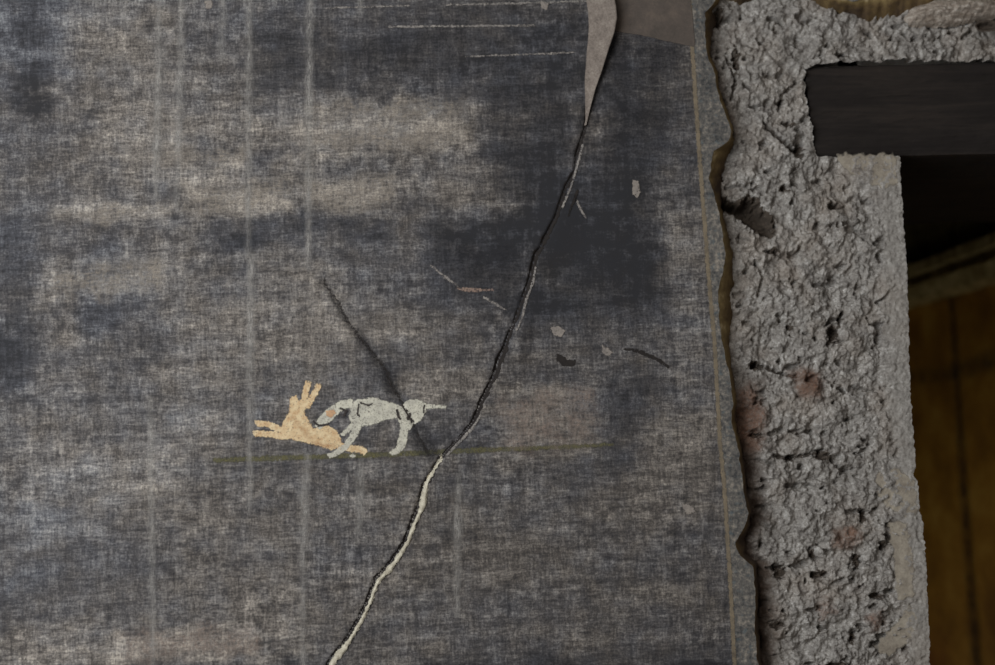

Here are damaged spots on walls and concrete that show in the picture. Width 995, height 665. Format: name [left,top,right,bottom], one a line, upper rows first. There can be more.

flaking render [811,0,934,22]
spalling [975,20,995,32]
flaking render [615,0,786,665]
spalling [602,345,669,368]
crack [324,109,588,665]